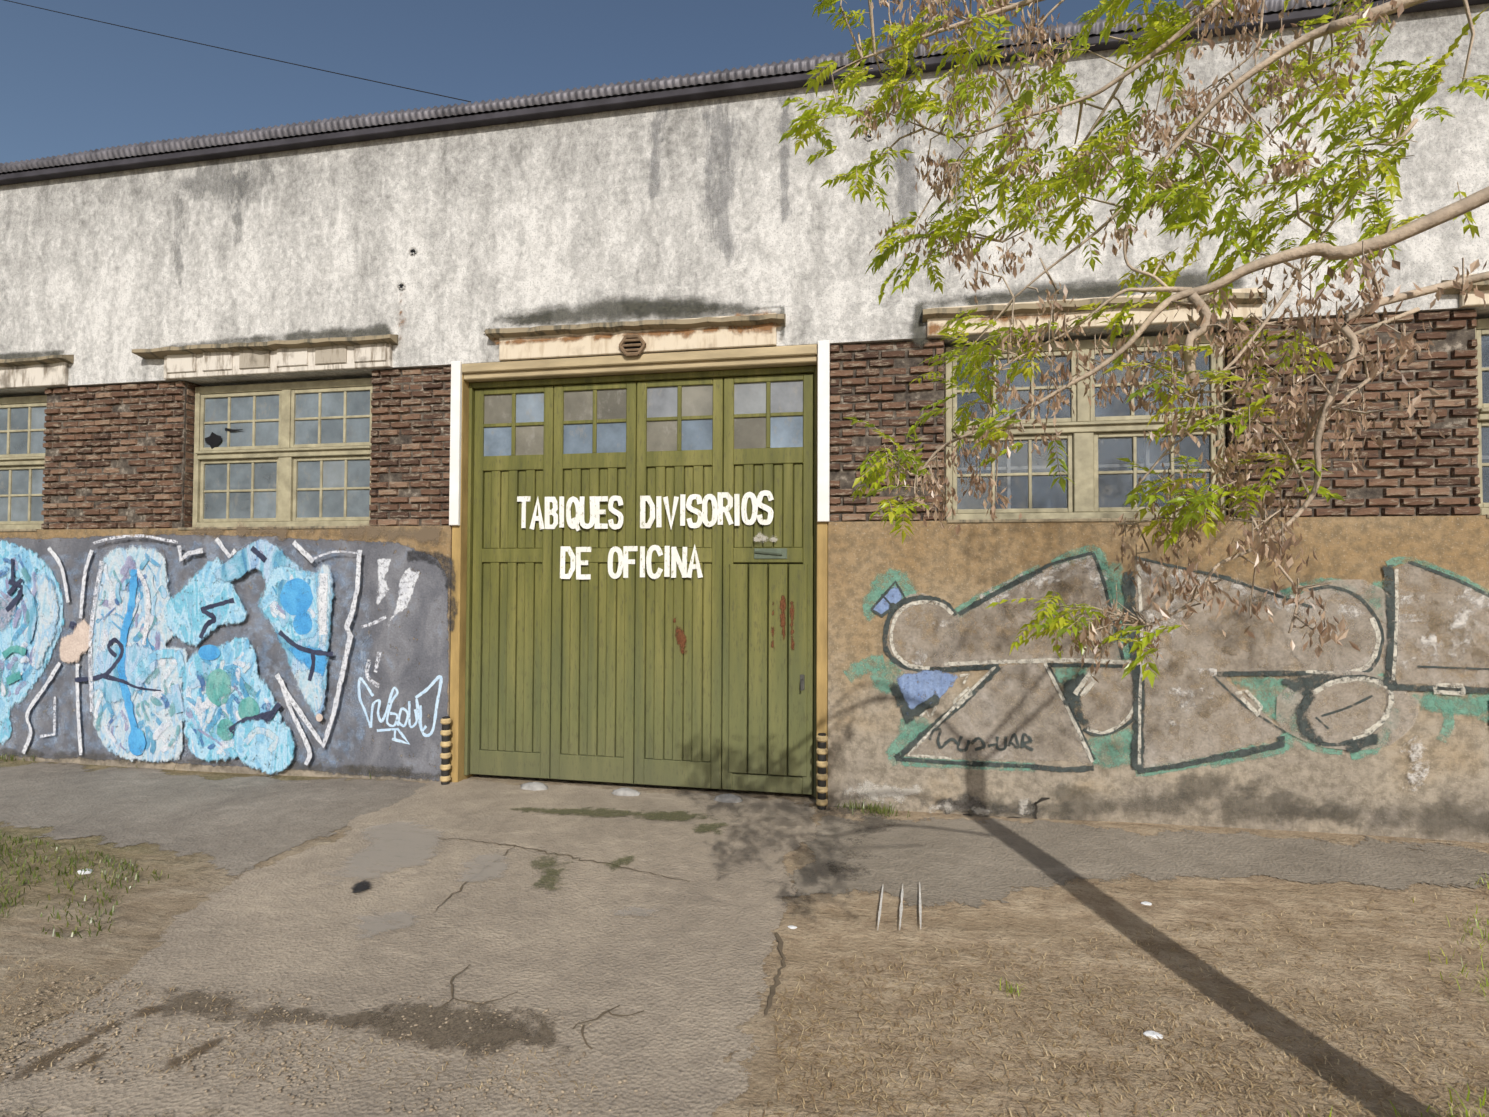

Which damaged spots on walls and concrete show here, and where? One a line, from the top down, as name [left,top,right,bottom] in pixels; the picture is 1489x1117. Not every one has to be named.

corrosion [673,618,687,654]
corrosion [771,595,794,650]
crack [765,932,786,1015]